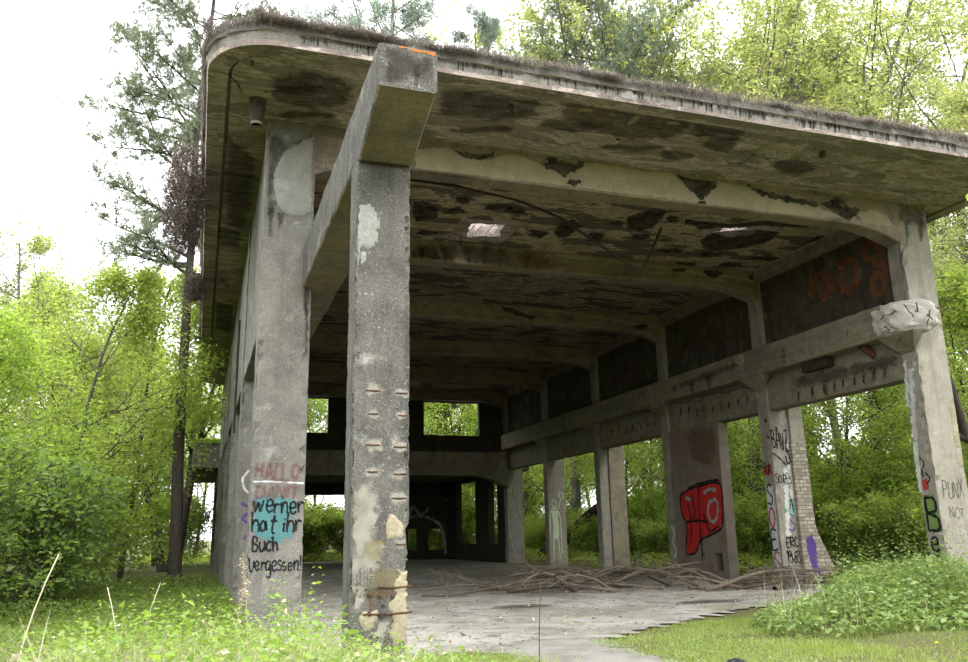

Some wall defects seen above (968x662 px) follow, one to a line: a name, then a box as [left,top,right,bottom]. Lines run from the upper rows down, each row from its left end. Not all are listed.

peeling [273,137,314,225]
peeling [357,204,380,266]
leakage [463,246,508,266]
peeling [410,147,897,279]
spalling [352,468,412,647]